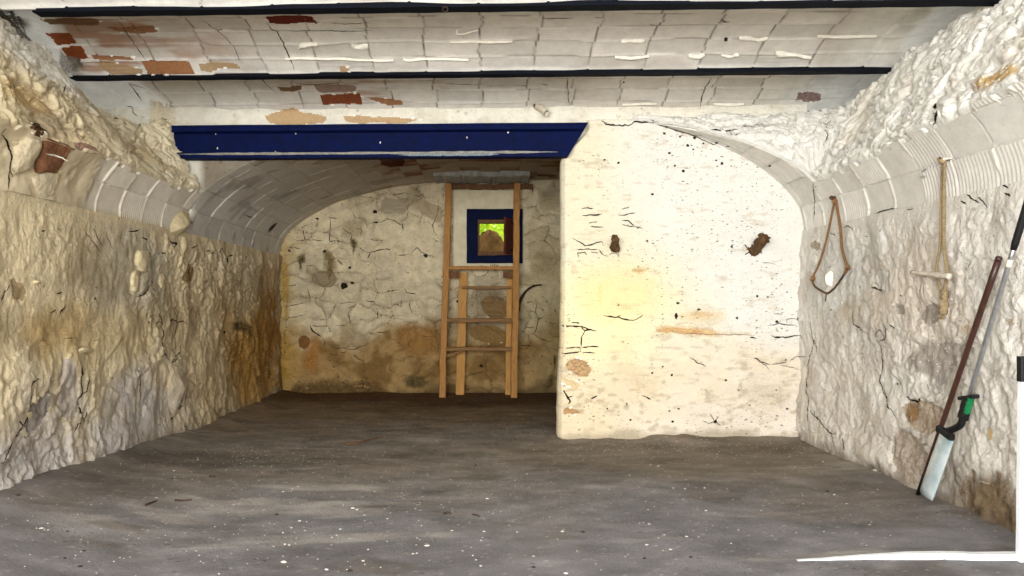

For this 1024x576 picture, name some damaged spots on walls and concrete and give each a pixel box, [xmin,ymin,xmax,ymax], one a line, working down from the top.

peeling [40,18,240,76]
peeling [264,15,323,24]
peeling [259,66,423,134]
flaking render [30,122,102,173]
crack [576,207,642,257]
leakage [229,265,288,384]
crack [519,284,643,354]
leakage [287,381,383,395]
leakage [406,376,427,388]
crack [665,313,844,449]
crack [852,306,929,422]
leakage [960,470,1010,521]